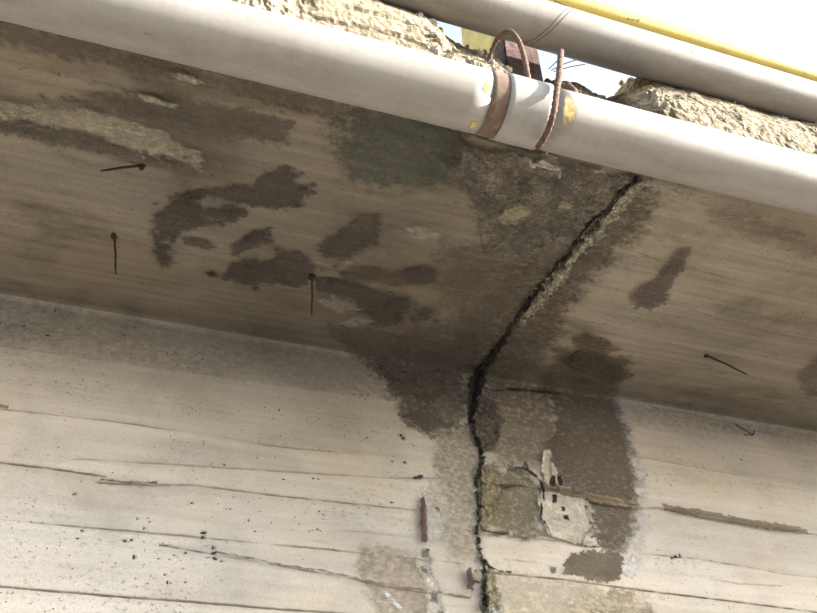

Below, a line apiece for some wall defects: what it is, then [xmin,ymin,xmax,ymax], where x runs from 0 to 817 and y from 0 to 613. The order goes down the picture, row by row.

corrosion [473,69,512,139]
damp [149,165,316,267]
damp [629,250,691,311]
damp [206,172,659,613]
crack [215,176,692,613]
spalling [538,449,600,547]